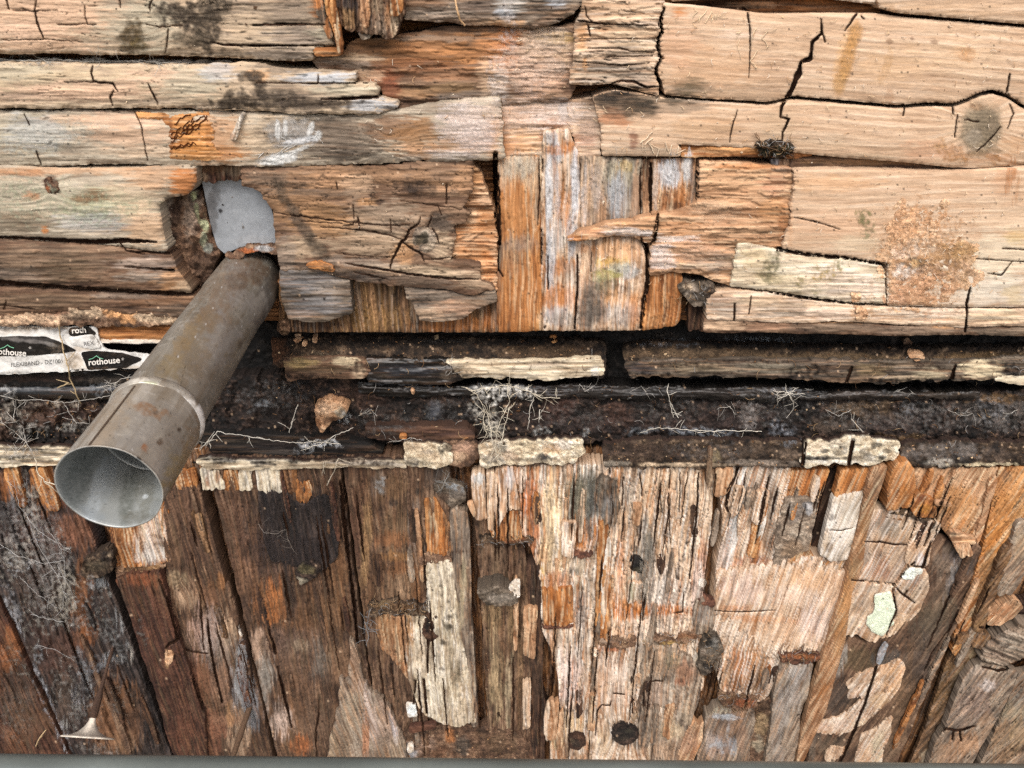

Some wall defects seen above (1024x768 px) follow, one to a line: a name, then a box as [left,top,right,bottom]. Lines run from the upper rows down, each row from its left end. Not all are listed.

damp [120,18,146,49]
damp [158,0,230,55]
crack [557,7,1024,152]
crack [275,154,503,280]
crack [639,163,659,328]
peeling [902,567,923,580]
crack [316,481,448,755]
peeling [866,591,896,636]
peeling [986,594,1023,626]